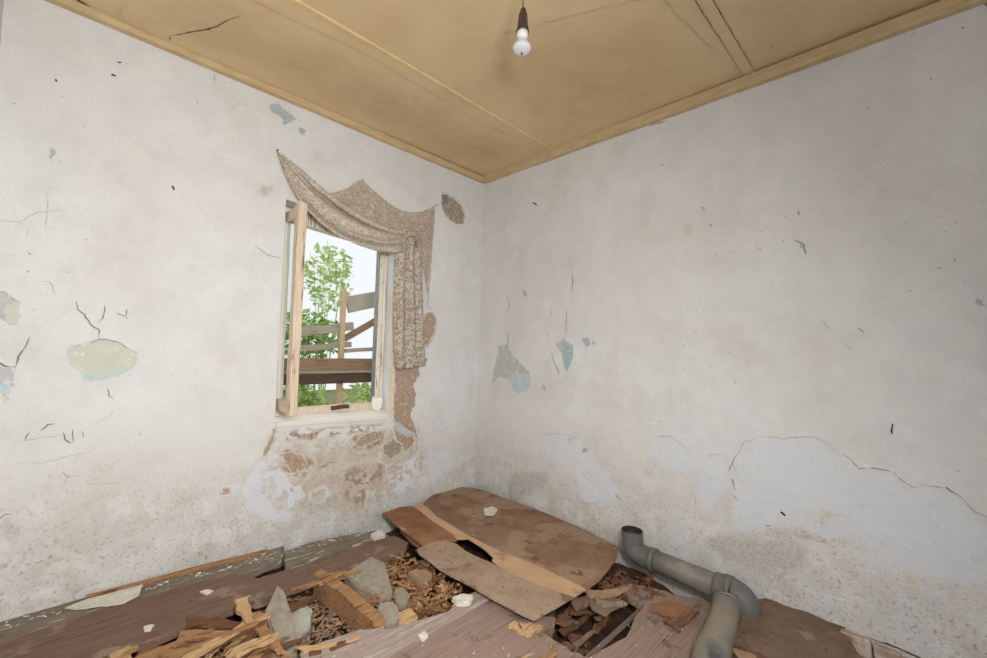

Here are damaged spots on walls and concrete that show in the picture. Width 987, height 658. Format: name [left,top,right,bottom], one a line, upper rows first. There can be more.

crack [169,17,237,40]
peeling [270,103,306,135]
spalling [441,191,466,225]
peeling [0,287,21,325]
peeling [0,337,30,405]
crack [43,281,128,338]
peeling [66,336,138,381]
peeling [423,299,437,348]
peeling [491,332,530,393]
peeling [551,310,595,373]